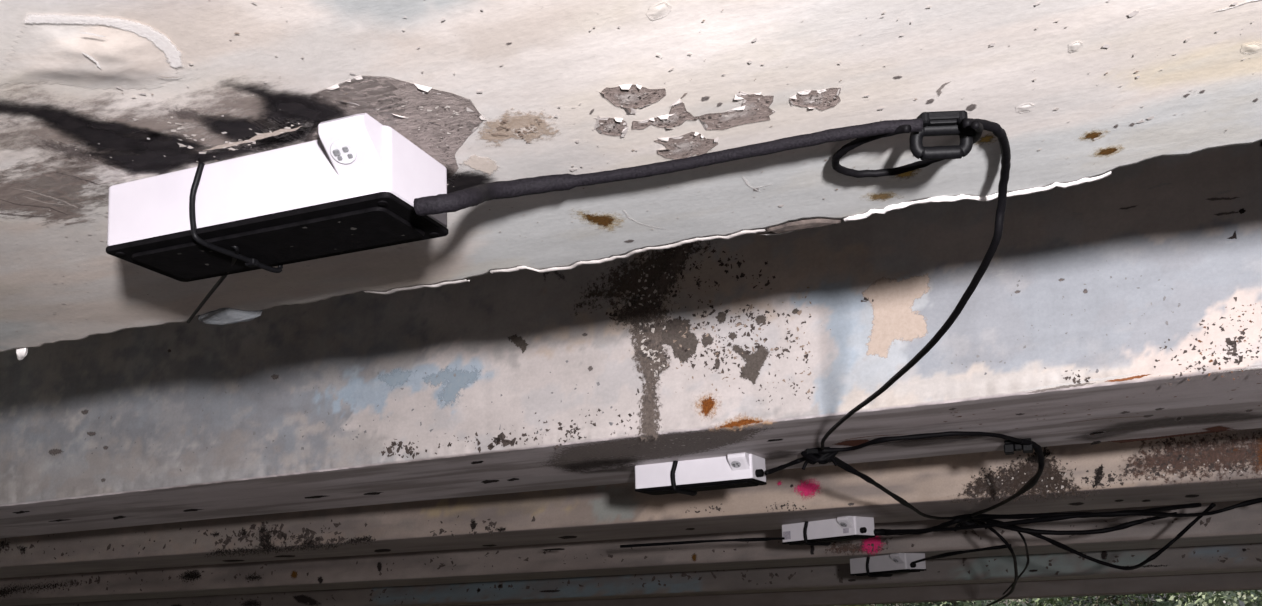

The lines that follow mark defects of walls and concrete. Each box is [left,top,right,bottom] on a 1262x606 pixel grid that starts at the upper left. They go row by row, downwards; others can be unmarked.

peeling [789,88,841,111]
spalling [304,75,559,177]
peeling [590,84,776,160]
corrosion [1081,131,1122,155]
corrosion [577,211,623,229]
peeling [861,273,930,358]
damp [381,240,831,459]
corrosion [696,397,717,416]
corrosion [716,417,772,429]